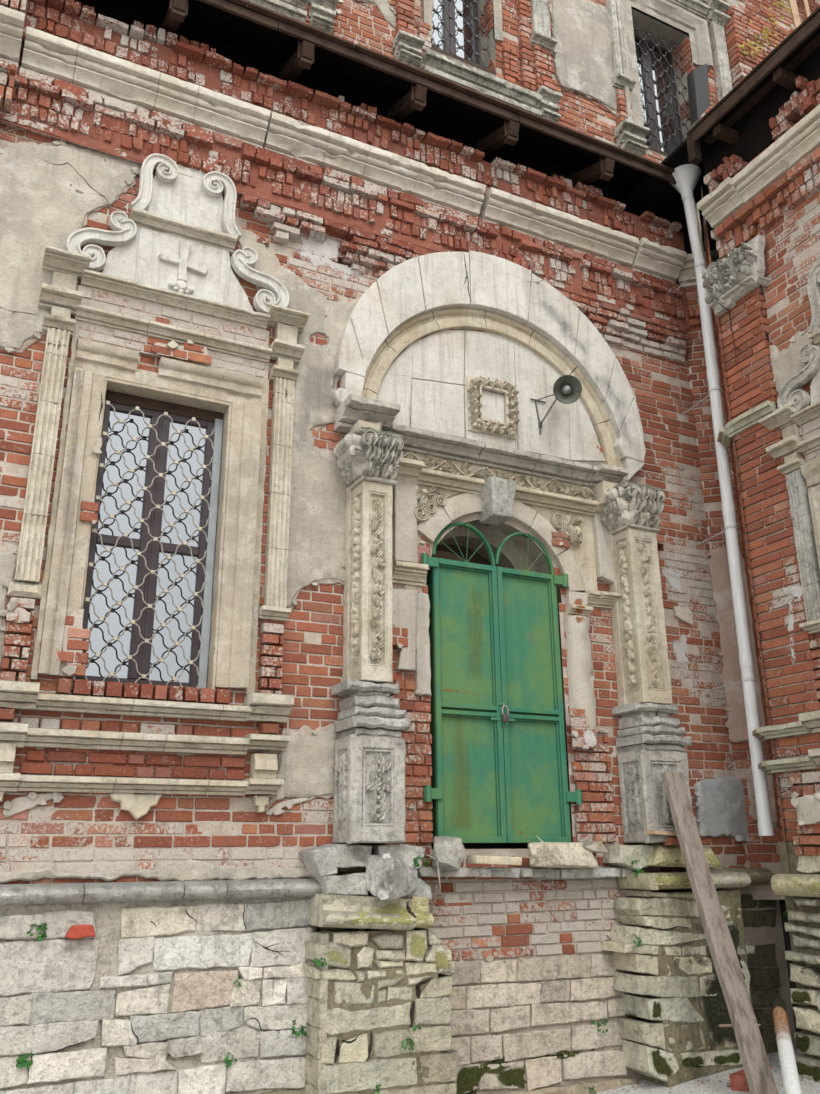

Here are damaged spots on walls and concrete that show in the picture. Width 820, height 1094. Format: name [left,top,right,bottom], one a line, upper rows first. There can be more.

flaking render [549,0,618,116]
flaking render [0,139,142,353]
flaking render [3,792,64,817]
flaking render [257,723,340,815]
crack [406,902,417,923]
mould [699,947,737,1049]
mould [728,924,745,980]